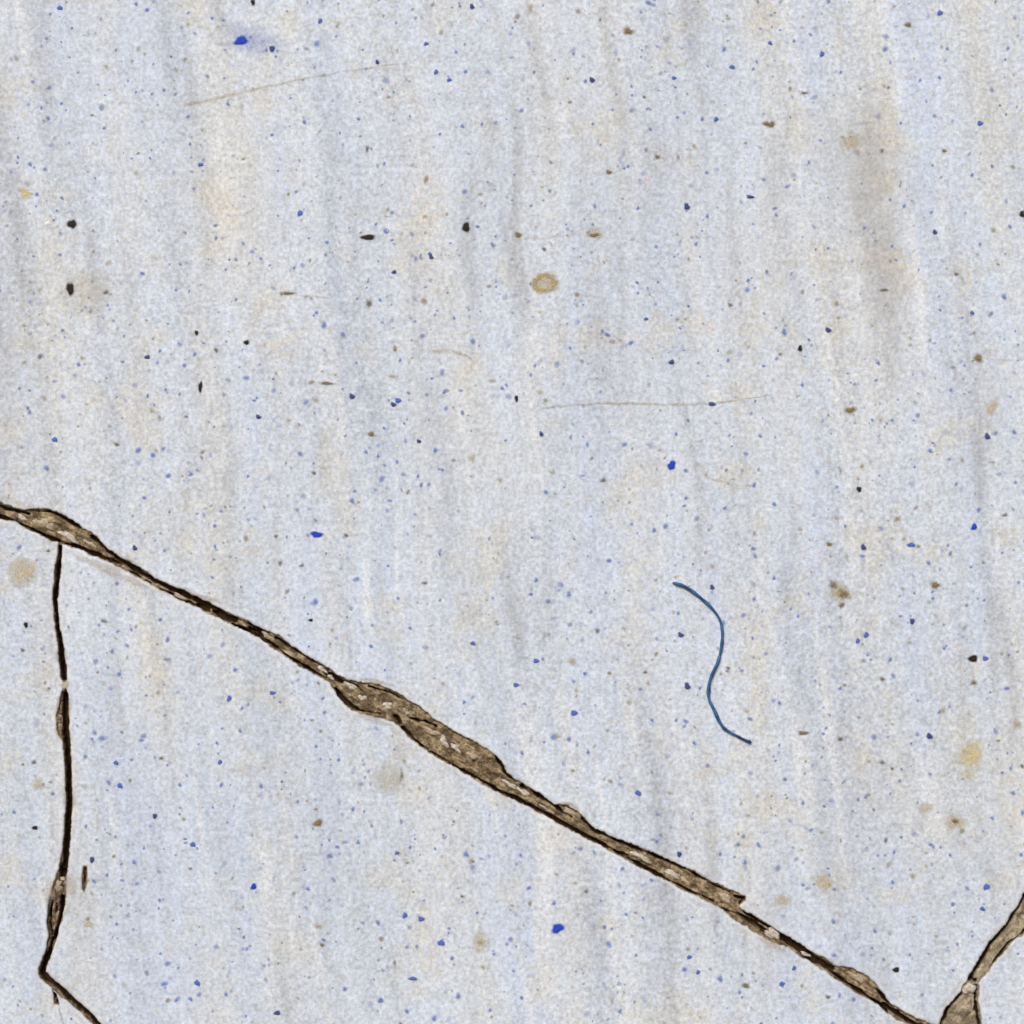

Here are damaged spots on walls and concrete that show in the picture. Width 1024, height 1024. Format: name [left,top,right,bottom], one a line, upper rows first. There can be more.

crack [0,498,1024,1024]